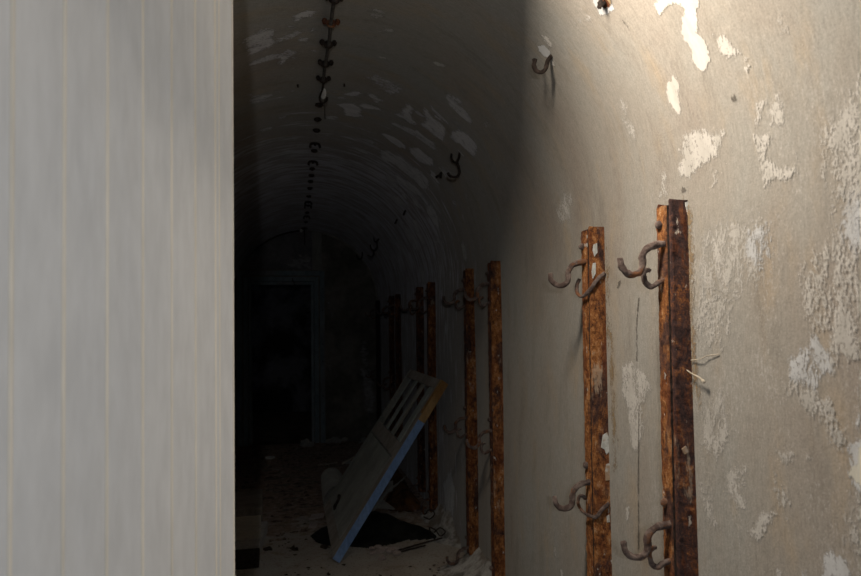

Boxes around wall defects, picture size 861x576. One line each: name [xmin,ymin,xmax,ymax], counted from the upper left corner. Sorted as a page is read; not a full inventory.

peeling [654,0,750,73]
peeling [677,128,726,193]
corrosion [688,203,702,405]